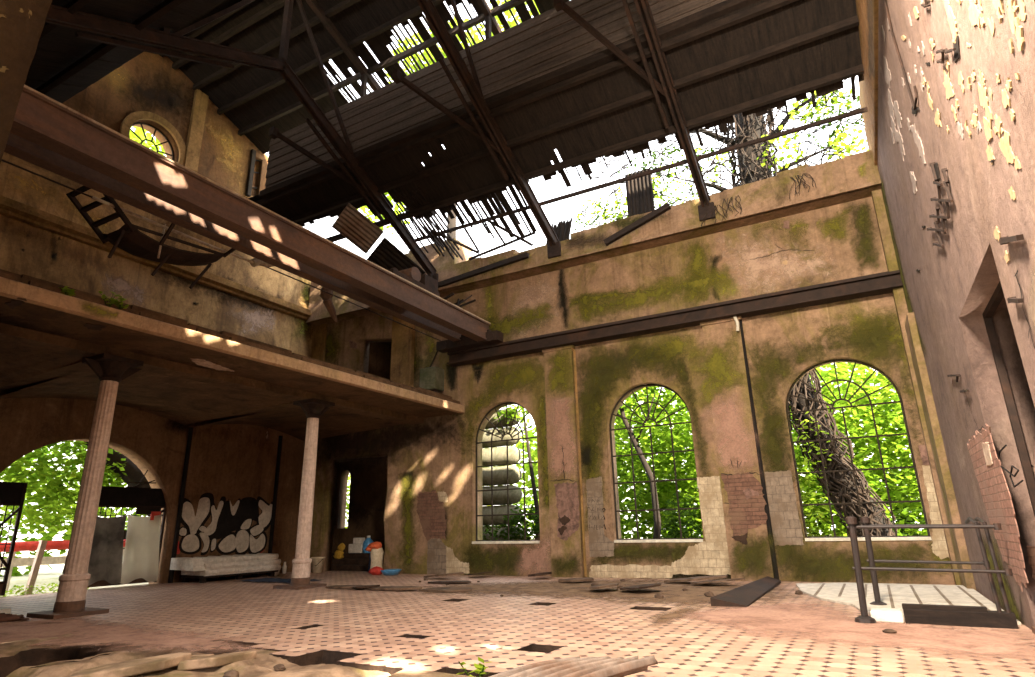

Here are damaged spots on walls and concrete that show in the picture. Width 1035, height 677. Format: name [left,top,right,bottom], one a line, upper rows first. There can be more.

peeling [883,0,1026,194]
peeling [994,226,1010,264]
leakage [512,269,620,334]
leakage [446,365,457,390]
leakage [473,364,483,382]
leakage [676,359,707,477]
leakage [538,396,549,508]
leakage [582,447,591,465]
spalling [416,490,447,541]
spalling [967,424,1035,592]
leakage [465,544,535,575]